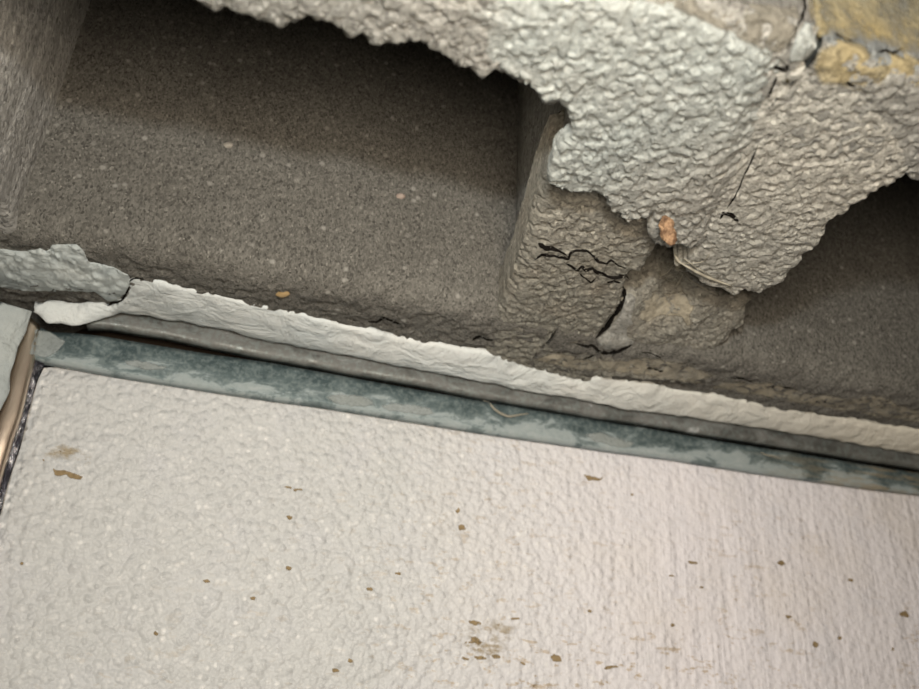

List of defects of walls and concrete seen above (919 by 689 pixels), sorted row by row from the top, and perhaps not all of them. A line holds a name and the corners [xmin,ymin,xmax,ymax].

leakage [810,0,919,47]
crack [535,243,662,372]